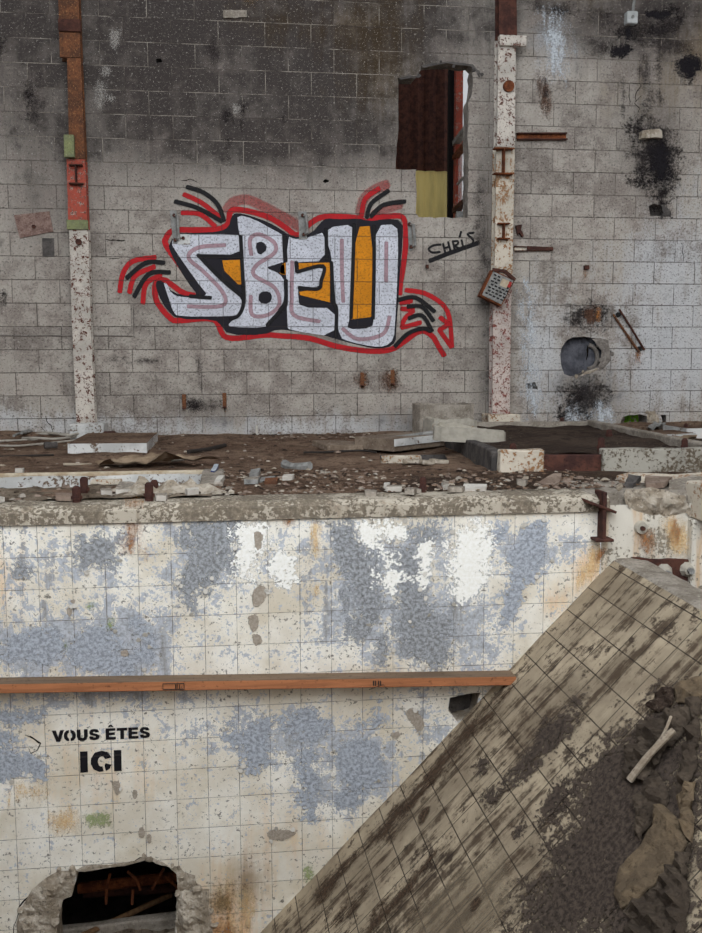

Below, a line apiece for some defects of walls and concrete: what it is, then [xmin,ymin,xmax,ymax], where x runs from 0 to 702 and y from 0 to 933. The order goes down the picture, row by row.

spalling [575,338,614,379]
water stain [554,388,582,421]
peeling [110,780,137,799]
spalling [17,853,218,933]